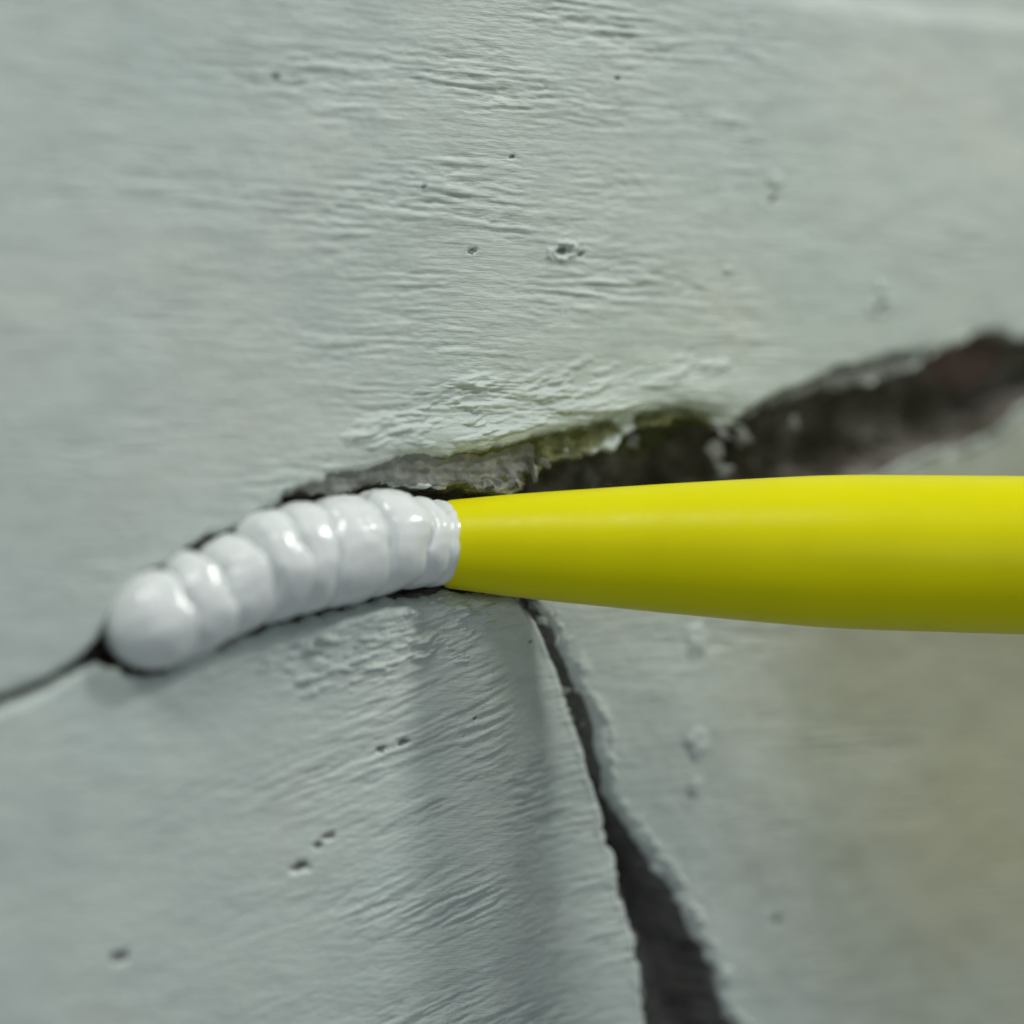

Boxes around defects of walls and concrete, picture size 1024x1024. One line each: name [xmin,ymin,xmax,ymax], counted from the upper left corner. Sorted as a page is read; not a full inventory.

peeling [258,352,735,511]
crack [275,329,1024,509]
crack [0,630,175,702]
crack [182,529,231,551]
crack [216,585,485,650]
crack [510,596,733,1024]